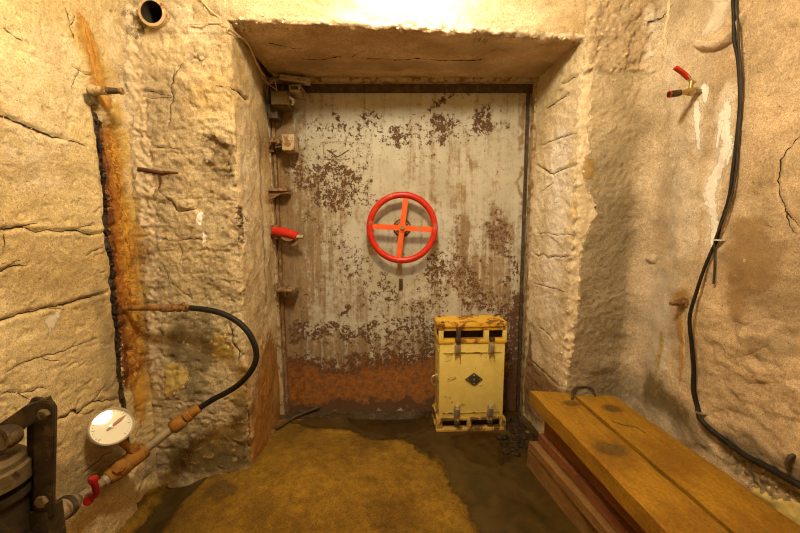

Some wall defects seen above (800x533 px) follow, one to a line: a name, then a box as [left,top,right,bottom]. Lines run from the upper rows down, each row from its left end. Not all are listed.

rust [77,12,112,111]
crack [0,115,87,147]
flaking render [235,6,635,387]
leakage [693,83,709,150]
leakage [702,97,734,247]
crack [777,136,800,233]
crack [0,223,103,272]
crack [0,293,104,321]
crack [7,338,97,372]
rust [243,332,280,465]